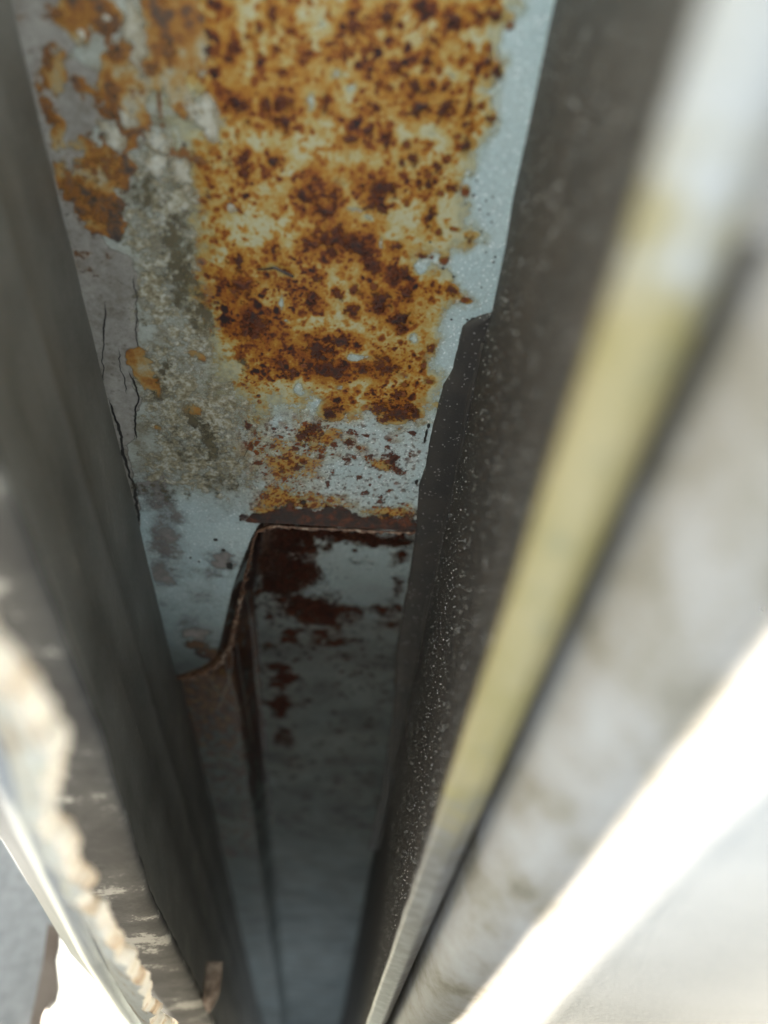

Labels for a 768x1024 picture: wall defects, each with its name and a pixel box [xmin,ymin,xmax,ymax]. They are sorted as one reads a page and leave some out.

crack [101,272,140,525]
corrosion [29,0,524,857]